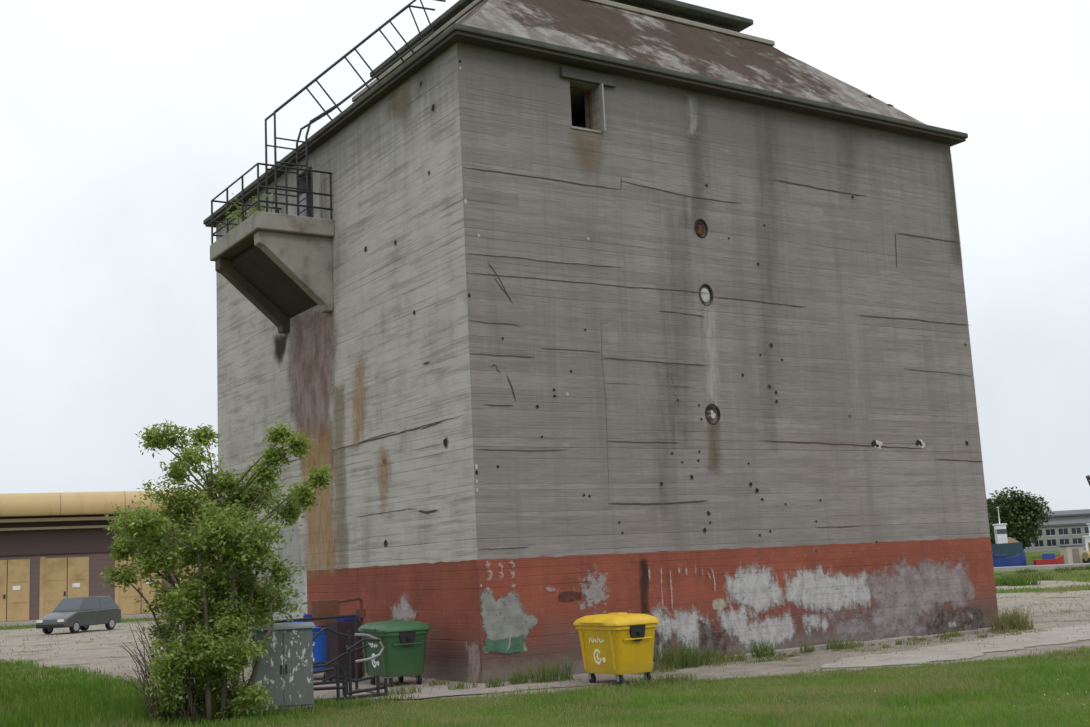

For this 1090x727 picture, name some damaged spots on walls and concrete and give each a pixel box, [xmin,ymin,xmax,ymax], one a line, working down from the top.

rust [289,312,335,572]
rust [354,364,363,443]
peeling [466,585,538,683]
peeling [546,564,610,614]
peeling [652,557,983,662]